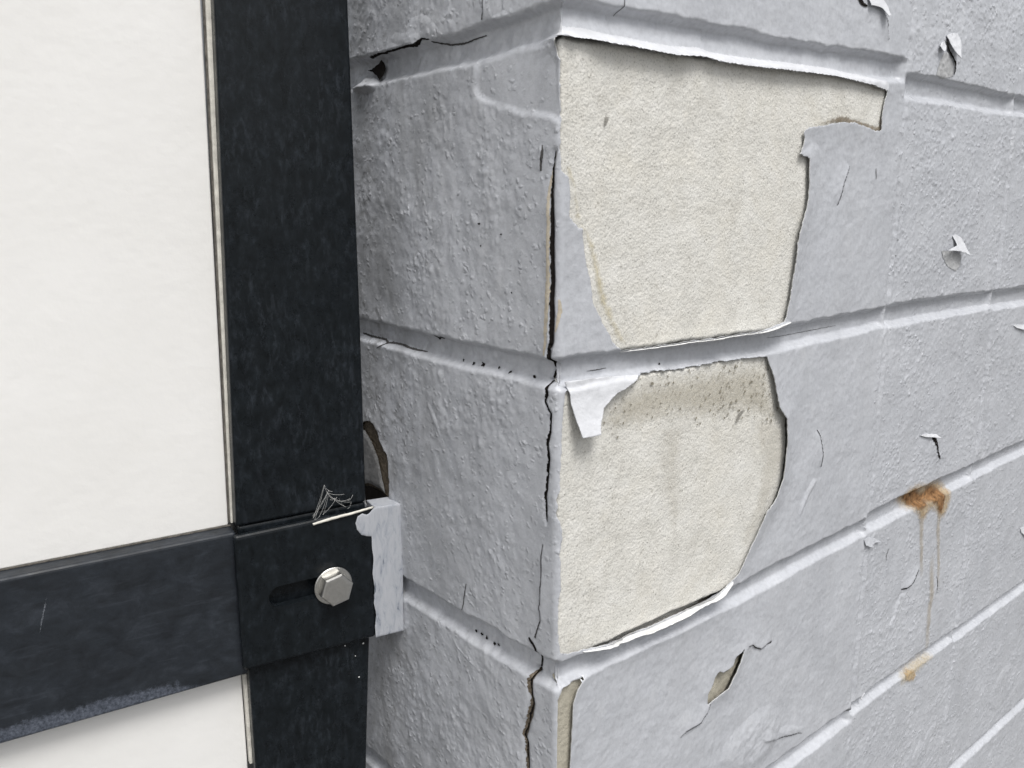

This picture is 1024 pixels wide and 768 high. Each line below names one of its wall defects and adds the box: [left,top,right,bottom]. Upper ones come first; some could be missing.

crack [370,15,487,59]
peeling [937,33,962,79]
peeling [555,22,889,352]
peeling [942,235,971,271]
crack [540,145,562,519]
spalling [363,421,389,504]
peeling [555,357,786,653]
corrosion [899,483,950,516]
crack [522,545,543,768]
peeling [552,673,584,768]
peeling [685,641,772,734]